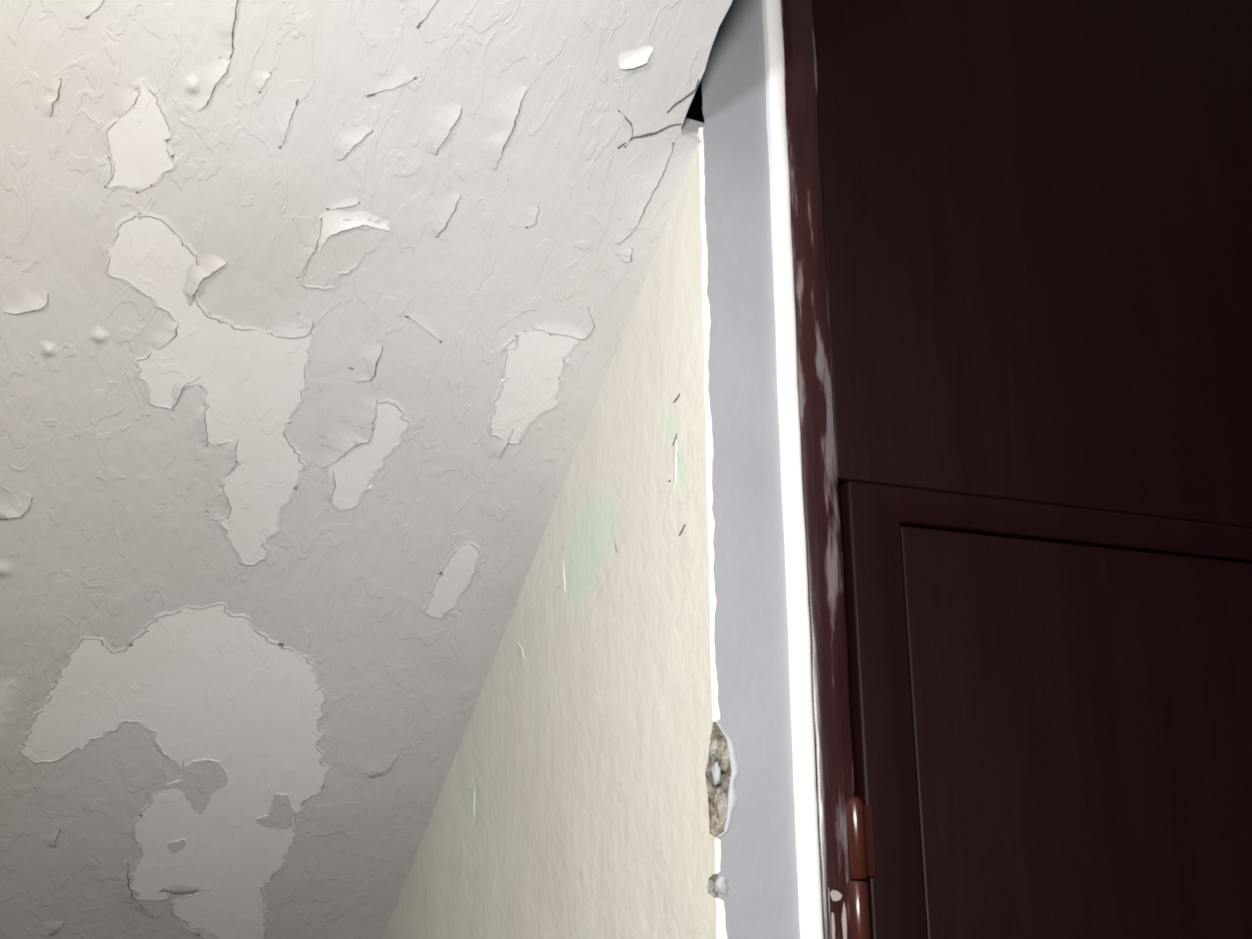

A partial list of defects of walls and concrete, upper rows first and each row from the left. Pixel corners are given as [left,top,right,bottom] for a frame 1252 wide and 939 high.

peeling [96,76,178,193]
peeling [412,101,462,156]
peeling [473,83,529,170]
peeling [286,193,391,292]
peeling [0,285,49,315]
peeling [101,211,414,566]
peeling [482,301,595,458]
peeling [0,484,33,519]
peeling [421,541,484,620]
peeling [17,602,332,939]